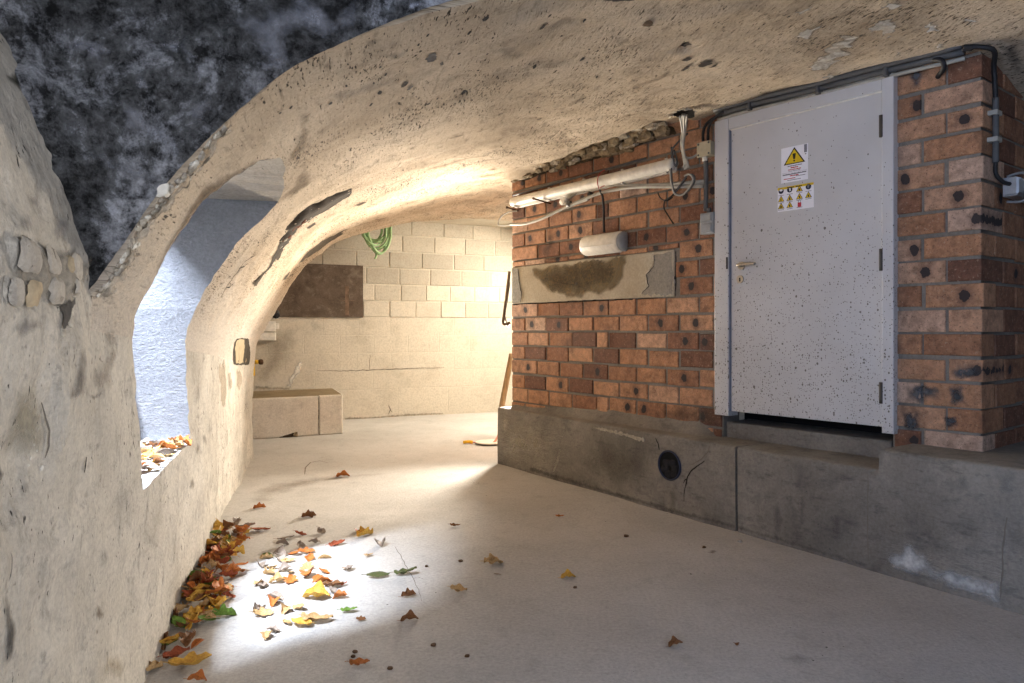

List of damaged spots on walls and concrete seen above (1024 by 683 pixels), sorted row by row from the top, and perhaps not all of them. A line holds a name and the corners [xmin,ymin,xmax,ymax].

water stain [533,256,625,297]
flaking render [641,252,675,298]
crack [683,442,711,494]
water stain [891,547,996,597]